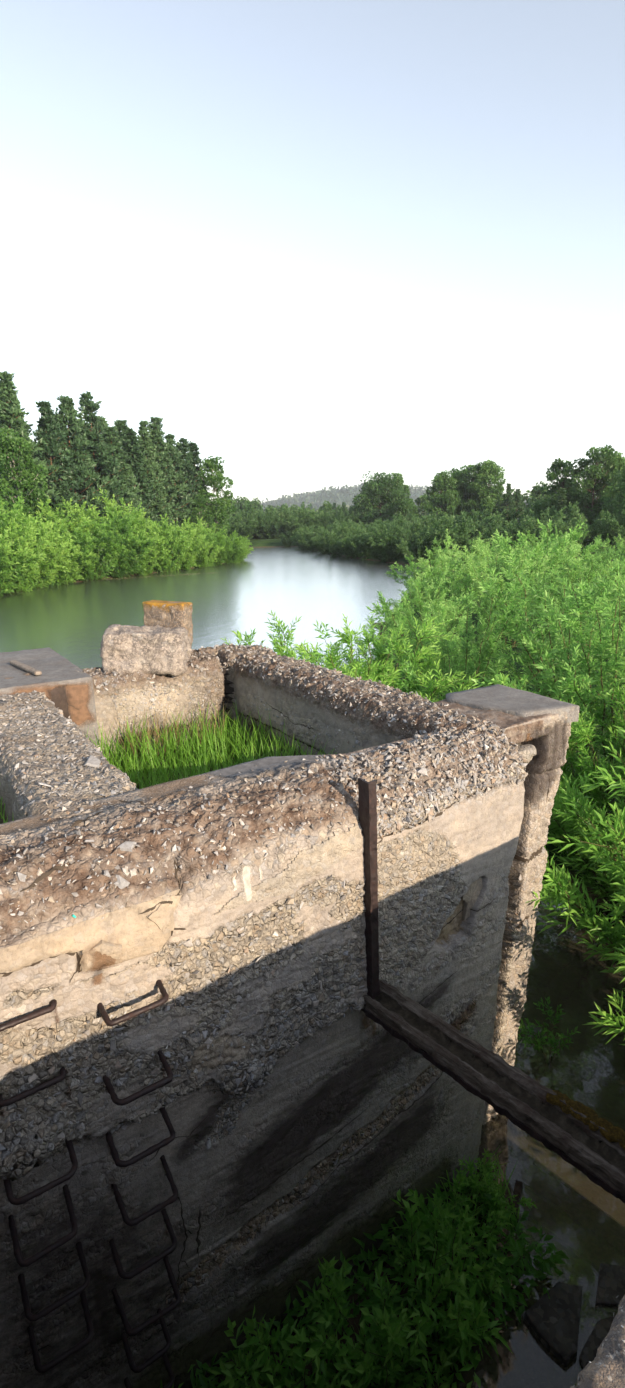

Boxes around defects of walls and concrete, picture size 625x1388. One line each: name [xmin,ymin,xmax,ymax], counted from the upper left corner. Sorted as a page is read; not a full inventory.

spalling [0,761,528,1157]
water stain [178,1101,223,1160]
water stain [225,1033,412,1209]
water stain [245,1094,435,1278]